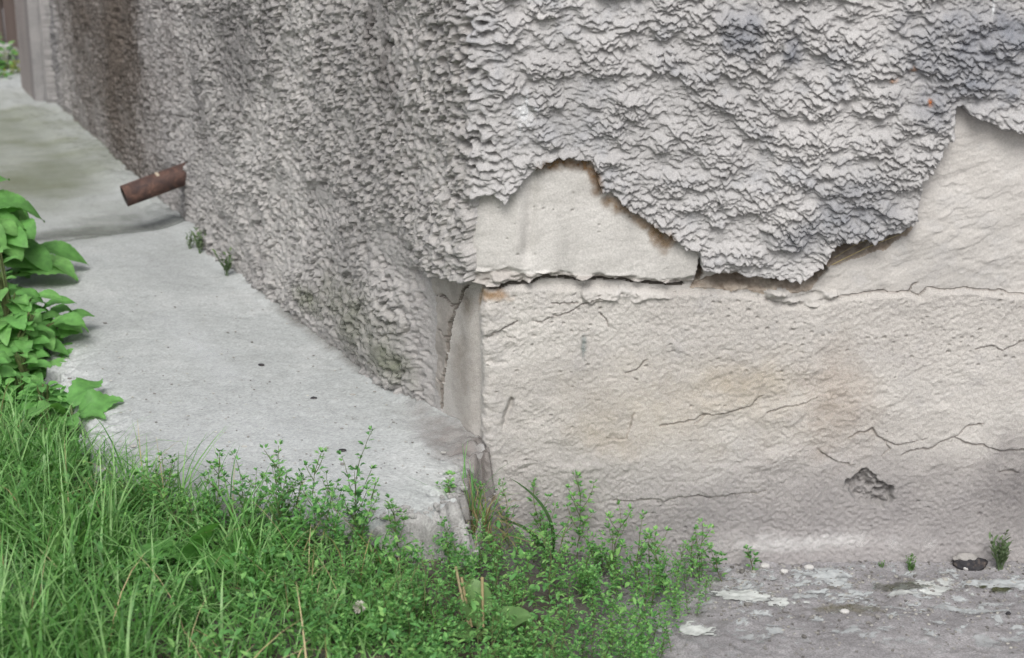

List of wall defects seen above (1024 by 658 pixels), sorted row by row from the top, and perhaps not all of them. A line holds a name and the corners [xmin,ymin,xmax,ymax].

flaking render [812,106,1024,295]
flaking render [471,158,765,306]
crack [836,282,1024,298]
crack [437,284,470,409]
peeling [482,329,516,366]
spalling [500,396,515,431]
crack [659,395,817,428]
crack [818,423,1024,474]
crack [613,490,767,503]
hole [843,467,895,510]